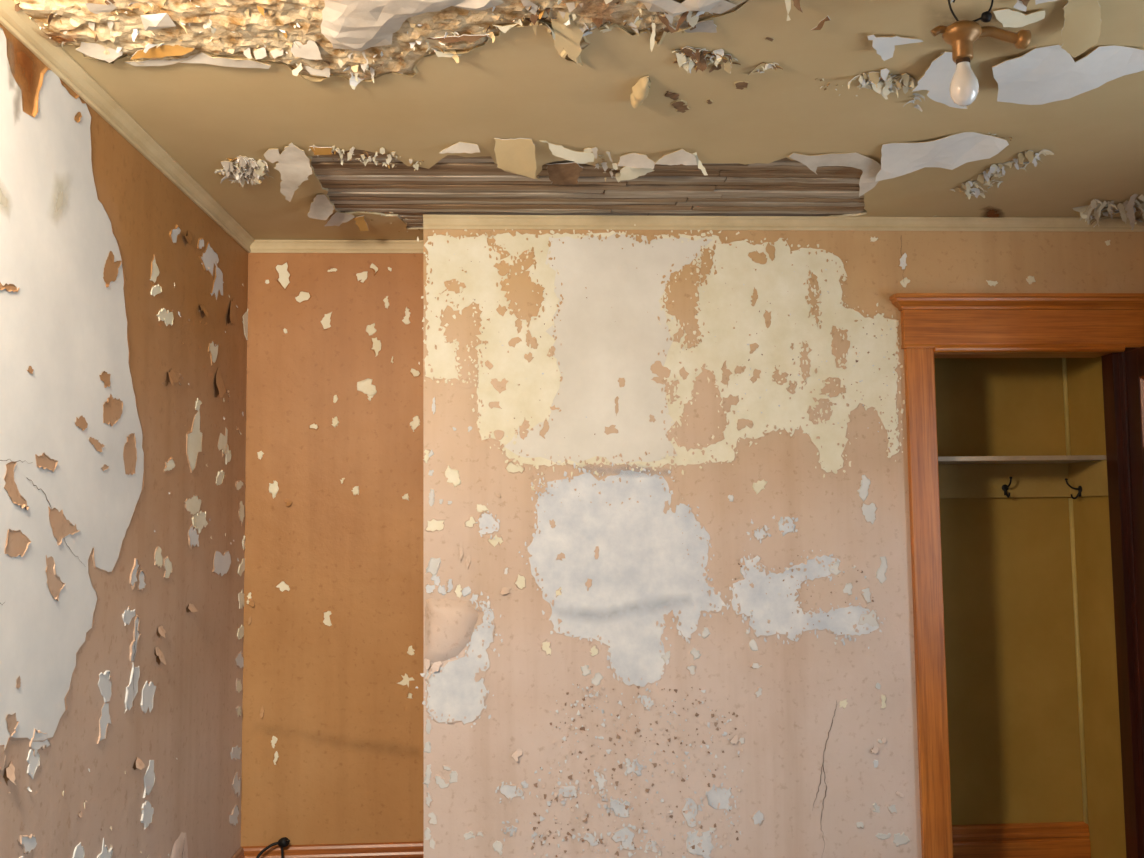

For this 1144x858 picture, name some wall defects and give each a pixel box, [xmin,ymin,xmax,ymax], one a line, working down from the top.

peeling [14,0,783,90]
peeling [665,91,690,113]
peeling [815,34,967,112]
peeling [992,0,1144,105]
spalling [149,255,175,296]
peeling [0,25,145,794]
spalling [156,224,255,717]
peeling [214,132,1054,858]
spalling [129,546,173,592]
spalling [97,607,156,744]
spalling [125,757,155,830]
spalling [72,827,113,858]